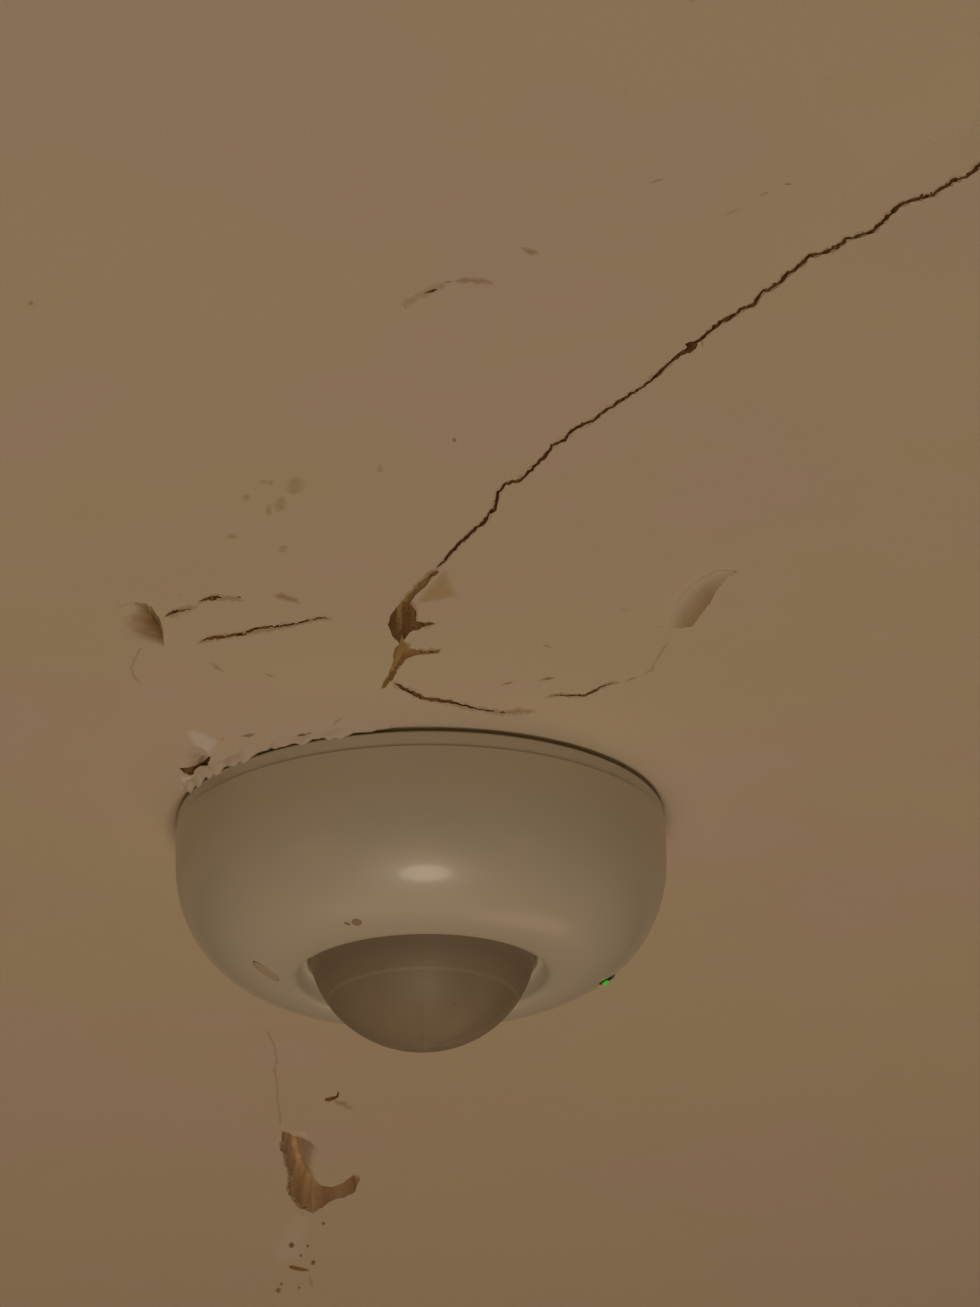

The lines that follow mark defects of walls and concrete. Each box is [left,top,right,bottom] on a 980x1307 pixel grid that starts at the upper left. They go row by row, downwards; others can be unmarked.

crack [399,275,495,309]
crack [436,158,980,569]
flaking render [108,602,164,686]
crack [162,591,335,673]
flaking render [380,567,461,689]
crack [390,639,670,717]
flaking render [655,570,739,629]
flaking render [178,715,390,796]
flaking render [264,1130,360,1293]